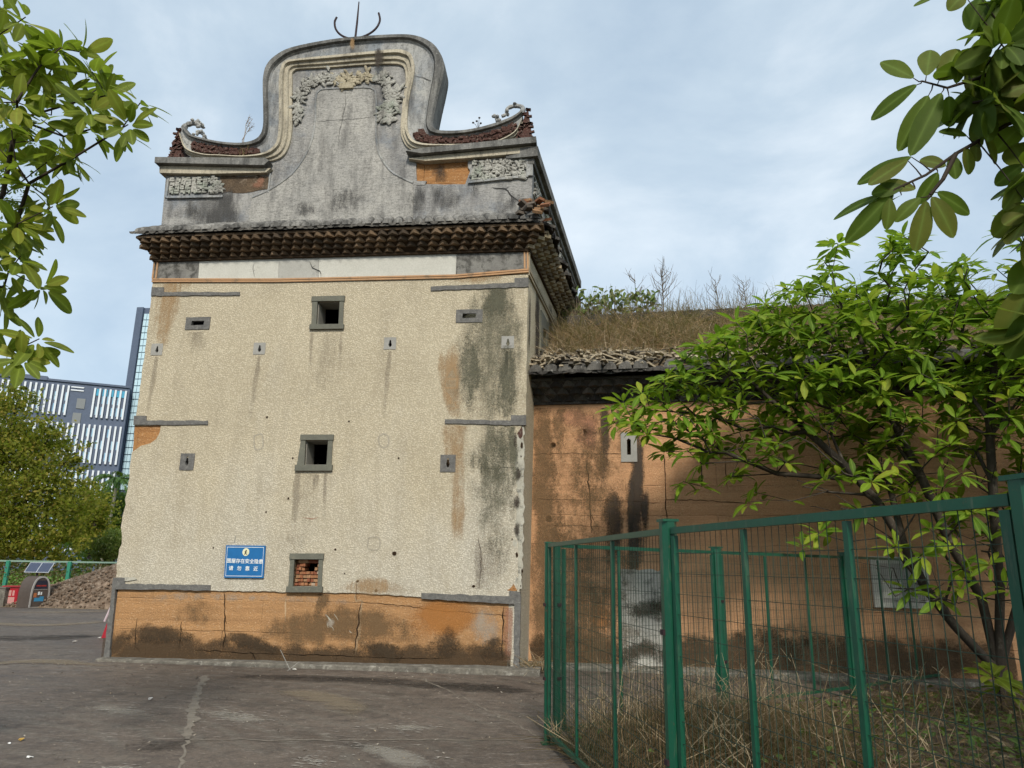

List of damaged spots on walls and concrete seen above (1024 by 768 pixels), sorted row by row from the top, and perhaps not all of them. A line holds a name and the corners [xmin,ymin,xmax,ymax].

spalling [416,162,470,185]
leakage [484,289,508,312]
leakage [461,346,480,400]
leakage [498,345,515,414]
spalling [133,426,161,451]
leakage [479,407,663,664]
crack [207,594,267,658]
leakage [101,594,511,666]
crack [293,583,437,661]
leakage [682,634,715,668]
leakage [727,627,848,674]
leakage [862,635,994,678]